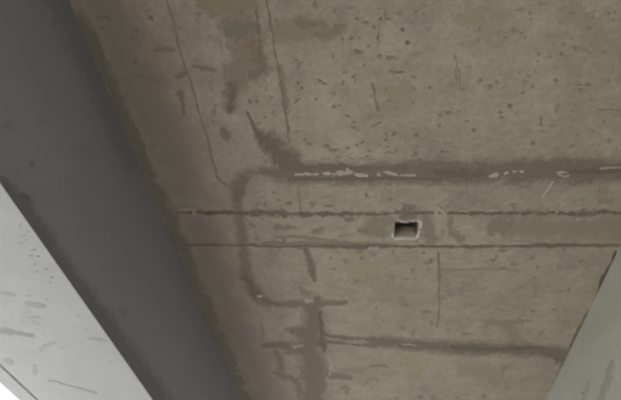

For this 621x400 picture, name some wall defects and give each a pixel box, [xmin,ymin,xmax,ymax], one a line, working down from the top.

crack [166,0,232,189]
crack [265,0,290,143]
damp [31,0,299,400]
damp [261,227,396,283]
crack [176,184,621,219]
crack [183,242,621,349]
damp [237,274,570,400]
damp [225,111,621,246]